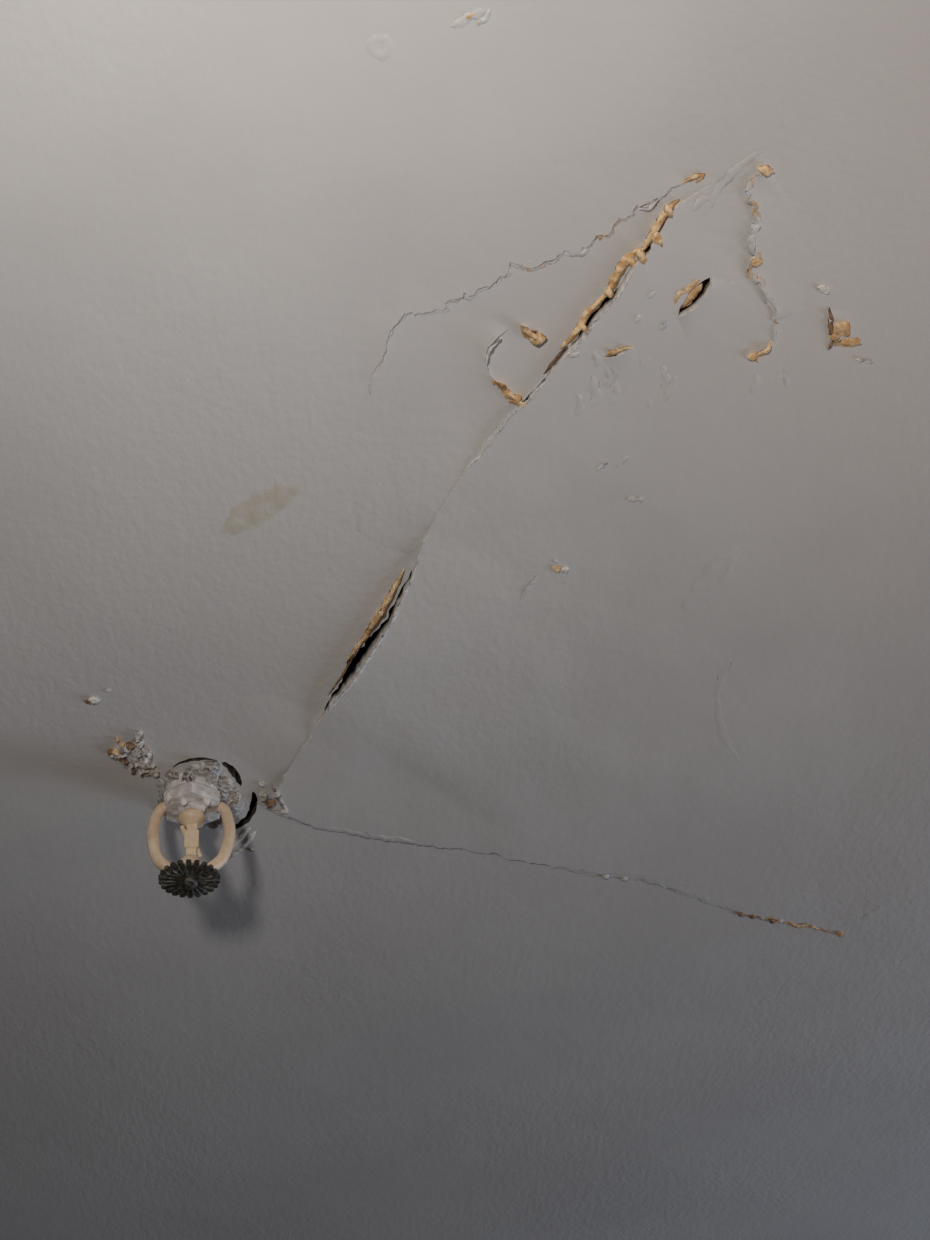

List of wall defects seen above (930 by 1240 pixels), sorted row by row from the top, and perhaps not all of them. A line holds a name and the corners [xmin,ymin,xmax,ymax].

peeling [674,165,881,364]
peeling [454,319,546,430]
crack [173,146,768,849]
spalling [106,731,161,778]
crack [555,866,895,937]